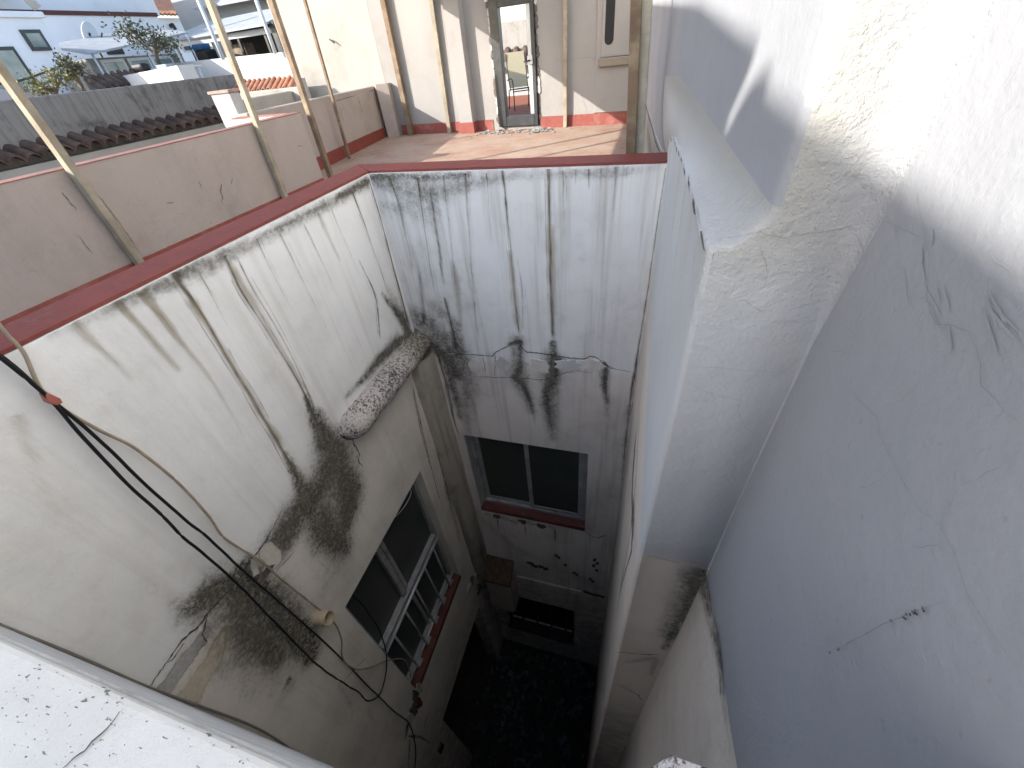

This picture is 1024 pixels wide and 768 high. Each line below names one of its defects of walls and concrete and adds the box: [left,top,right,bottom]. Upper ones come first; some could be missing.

damp [174,272,361,556]
damp [352,180,471,432]
damp [509,169,560,426]
crack [443,341,636,380]
damp [181,558,319,669]
damp [662,569,722,693]